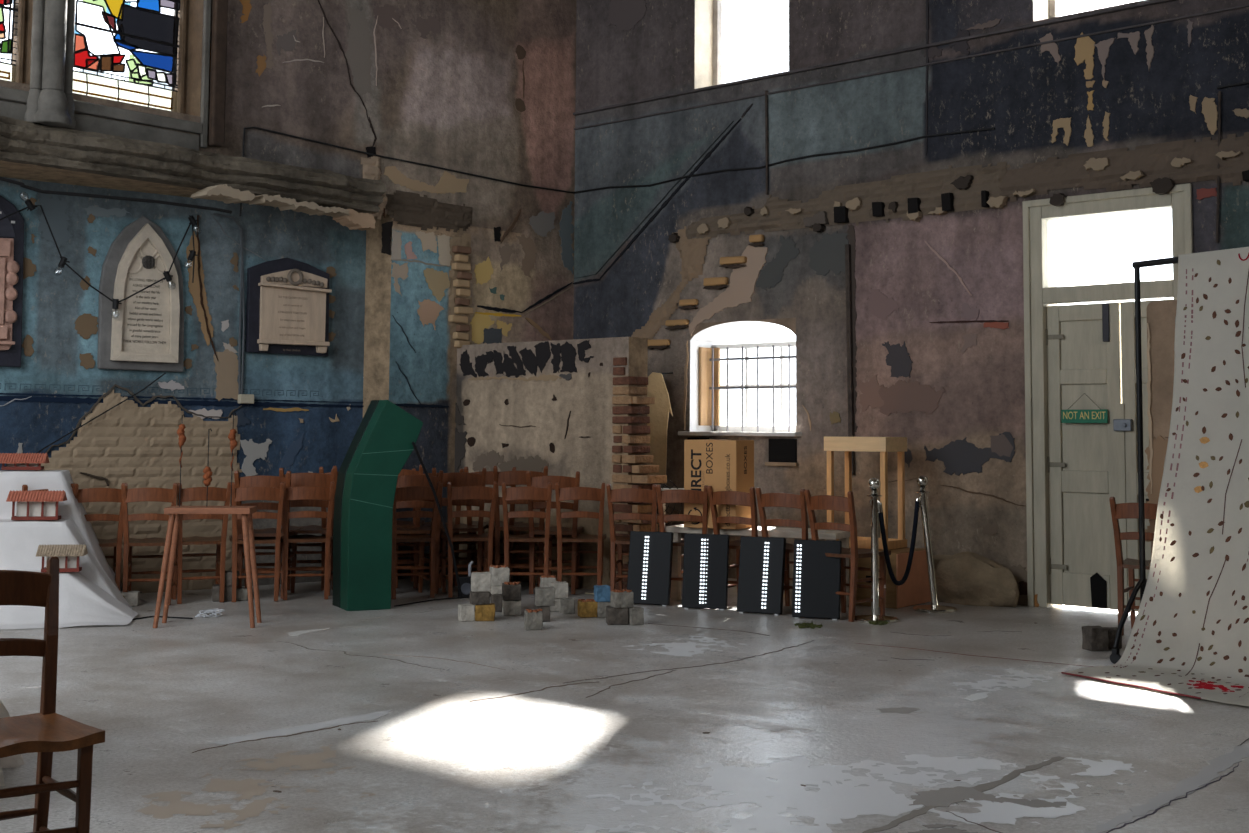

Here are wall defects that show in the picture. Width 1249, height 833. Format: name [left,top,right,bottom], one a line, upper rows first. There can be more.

spalling [631,25,1249,340]
spalling [190,146,512,345]
peeling [41,231,272,593]
crack [278,623,815,702]
damp [575,752,1147,833]
crack [946,811,1002,833]
crack [1106,738,1249,833]